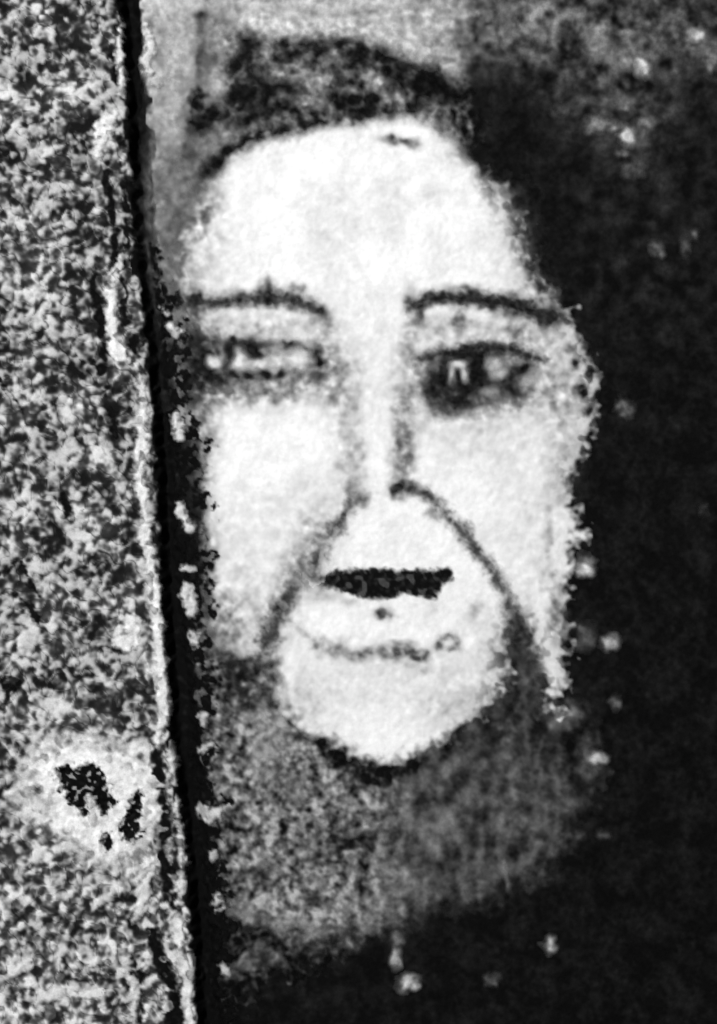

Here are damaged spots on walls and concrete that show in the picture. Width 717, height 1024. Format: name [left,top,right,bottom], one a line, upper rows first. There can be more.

spalling [114,17,126,96]
spalling [90,110,118,158]
spalling [104,255,130,363]
crack [88,0,241,1024]
spalling [4,375,179,920]
spalling [176,834,187,897]
spalling [121,968,140,1008]
spalling [165,903,195,1024]